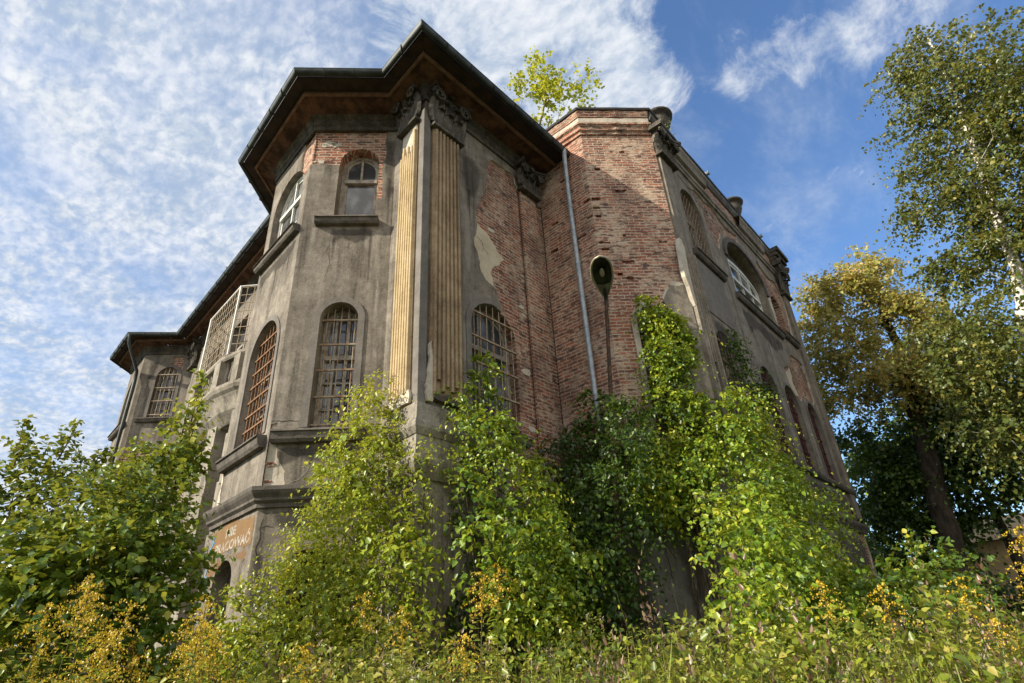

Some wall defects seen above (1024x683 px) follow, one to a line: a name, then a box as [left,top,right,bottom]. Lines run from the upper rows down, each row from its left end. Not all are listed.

spalling [301,141,343,175]